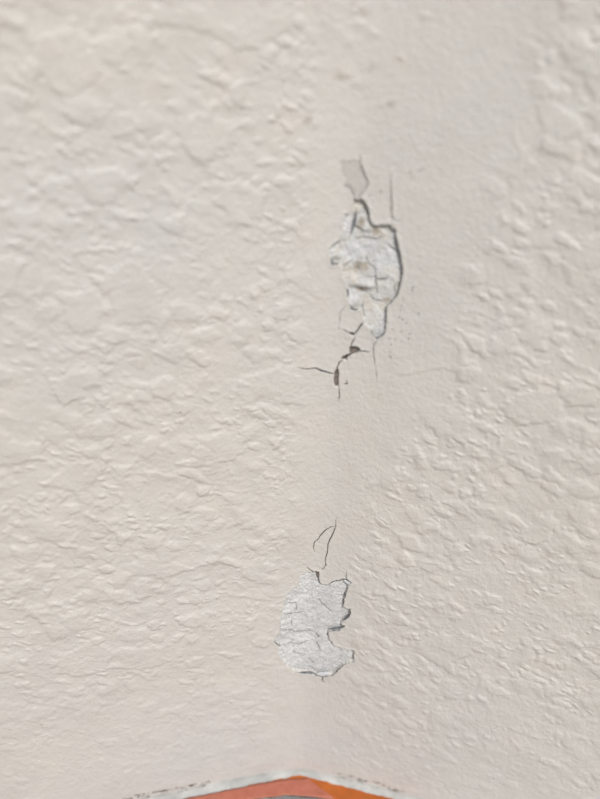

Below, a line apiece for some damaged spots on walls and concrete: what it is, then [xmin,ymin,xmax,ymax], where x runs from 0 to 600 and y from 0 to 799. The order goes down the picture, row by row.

spalling [329,158,403,339]
crack [301,319,377,397]
crack [307,521,336,578]
spalling [274,572,354,678]